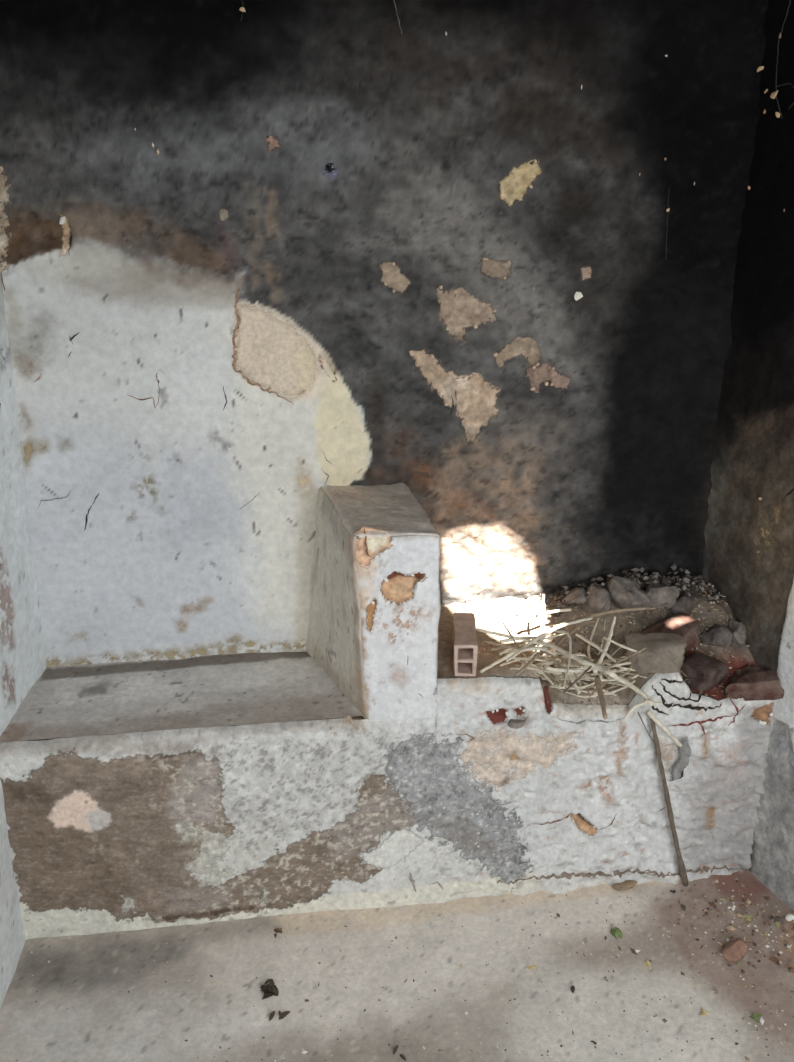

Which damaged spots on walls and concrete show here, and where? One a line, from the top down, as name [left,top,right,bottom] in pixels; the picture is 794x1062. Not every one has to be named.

flaking render [500,159,542,206]
flaking render [0,166,12,273]
flaking render [378,262,410,293]
flaking render [232,276,337,404]
flaking render [436,286,497,345]
flaking render [492,336,571,394]
flaking render [409,350,501,442]
flaking render [351,527,394,568]
flaking render [366,571,426,632]
flaking render [47,790,112,833]
flaking render [361,706,576,891]